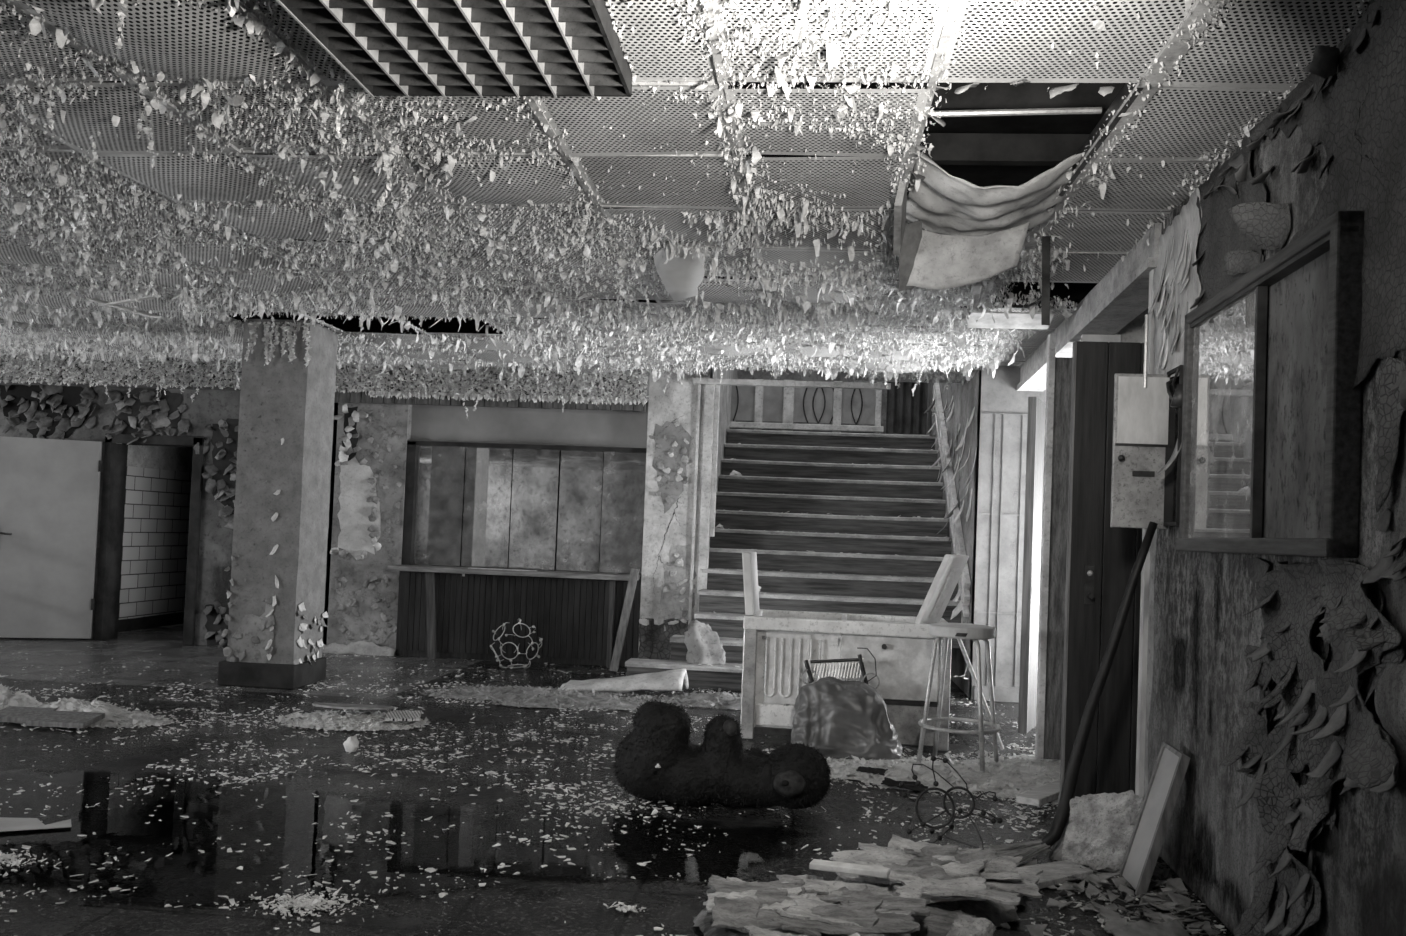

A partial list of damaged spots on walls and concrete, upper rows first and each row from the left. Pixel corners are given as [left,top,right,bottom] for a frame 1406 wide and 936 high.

peeling [0,0,1238,631]
peeling [1119,0,1406,936]
peeling [0,404,728,906]
peeling [929,639,1036,763]
peeling [768,747,1058,860]
peeling [164,895,239,910]
peeling [995,884,1139,936]